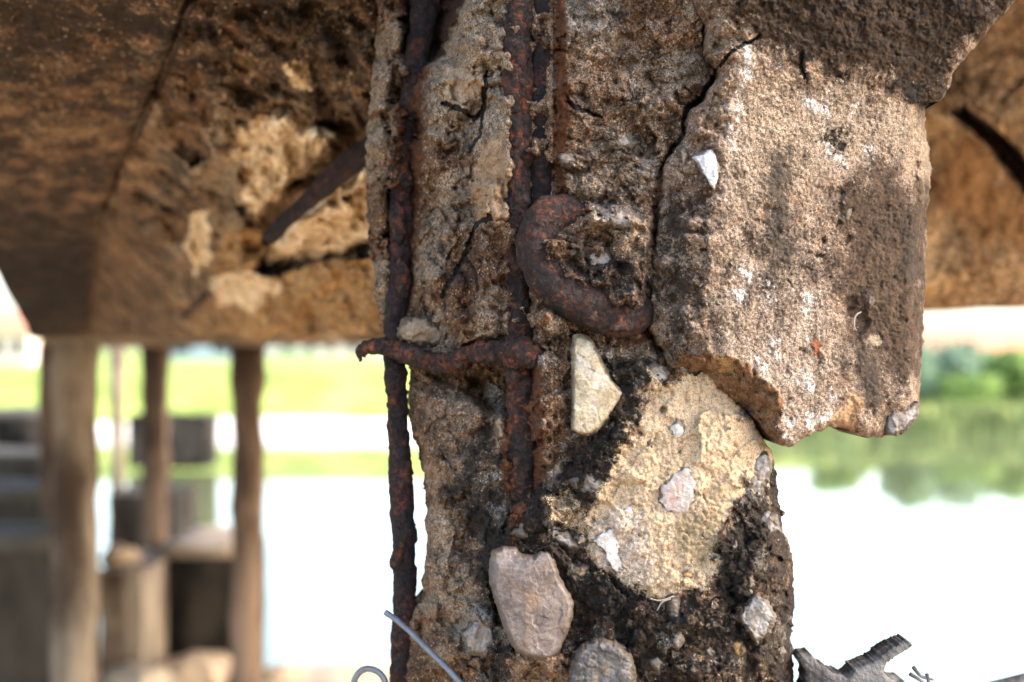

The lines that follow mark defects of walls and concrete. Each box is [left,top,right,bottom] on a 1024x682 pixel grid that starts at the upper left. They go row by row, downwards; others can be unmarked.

spalling [183,166,370,315]
spalling [227,107,336,214]
crack [244,239,371,277]
rust [386,68,434,288]
crack [441,70,489,154]
crack [440,213,493,298]
spalling [469,124,515,230]
rust [553,0,574,195]
crack [660,24,761,171]
rust [500,365,548,546]
damp [443,356,794,682]
spalling [676,354,786,445]